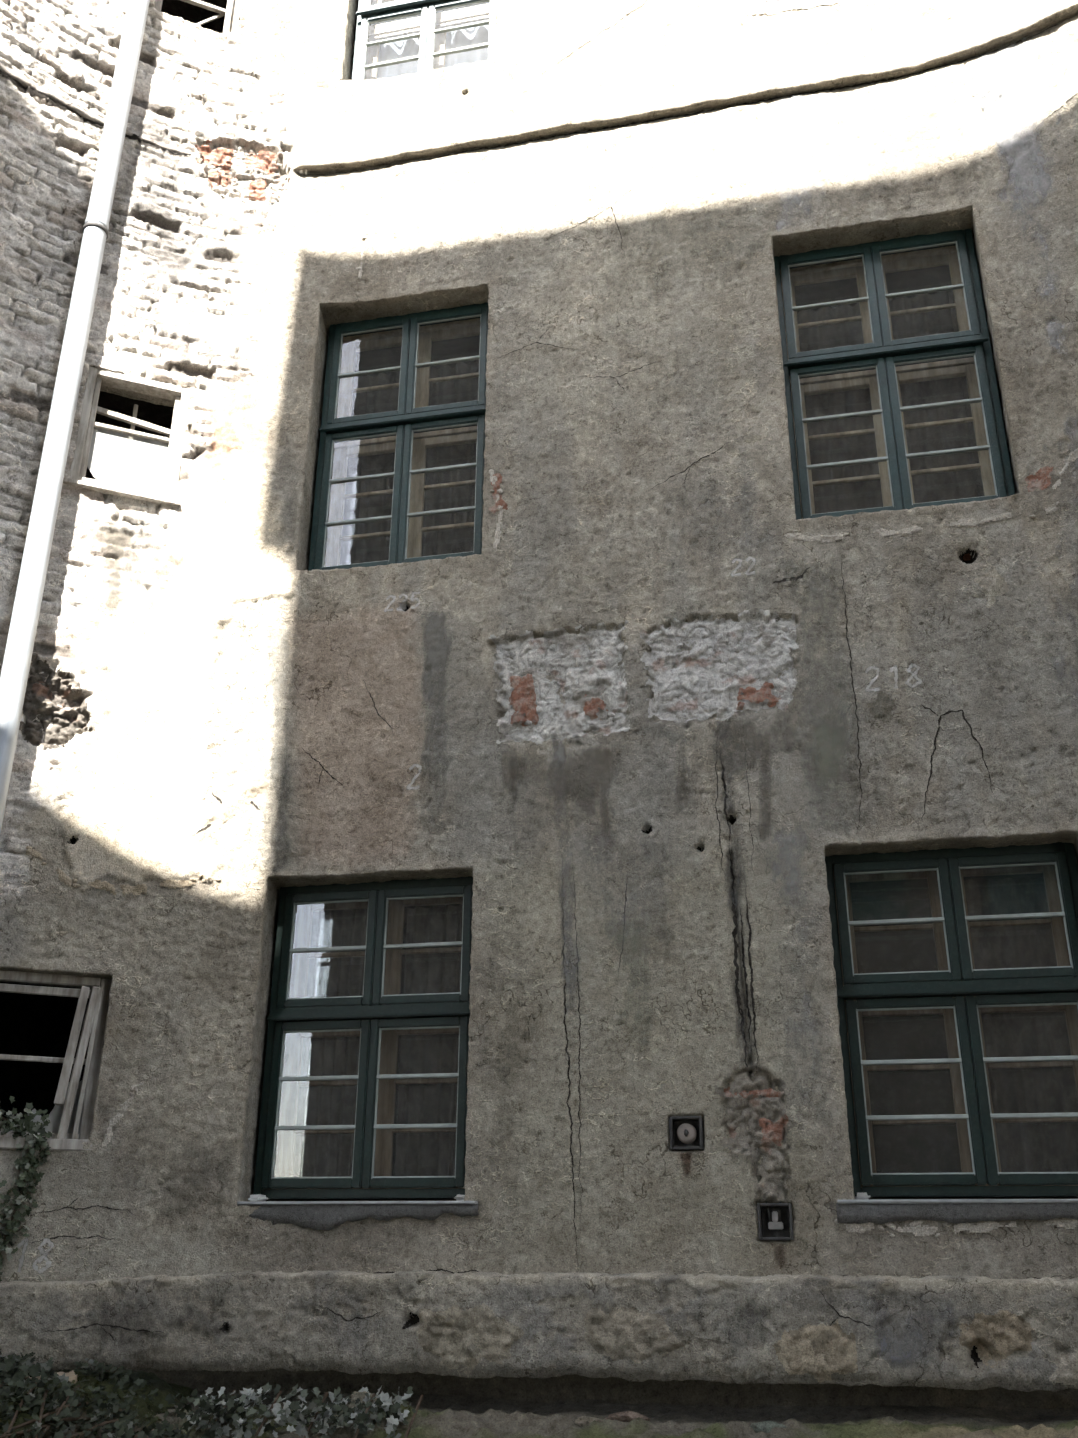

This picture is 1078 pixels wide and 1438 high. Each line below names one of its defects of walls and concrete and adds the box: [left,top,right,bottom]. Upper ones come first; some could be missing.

flaking render [195,140,278,201]
flaking render [19,653,95,749]
flaking render [489,609,799,745]
crack [922,705,992,817]
flaking render [715,1063,792,1208]